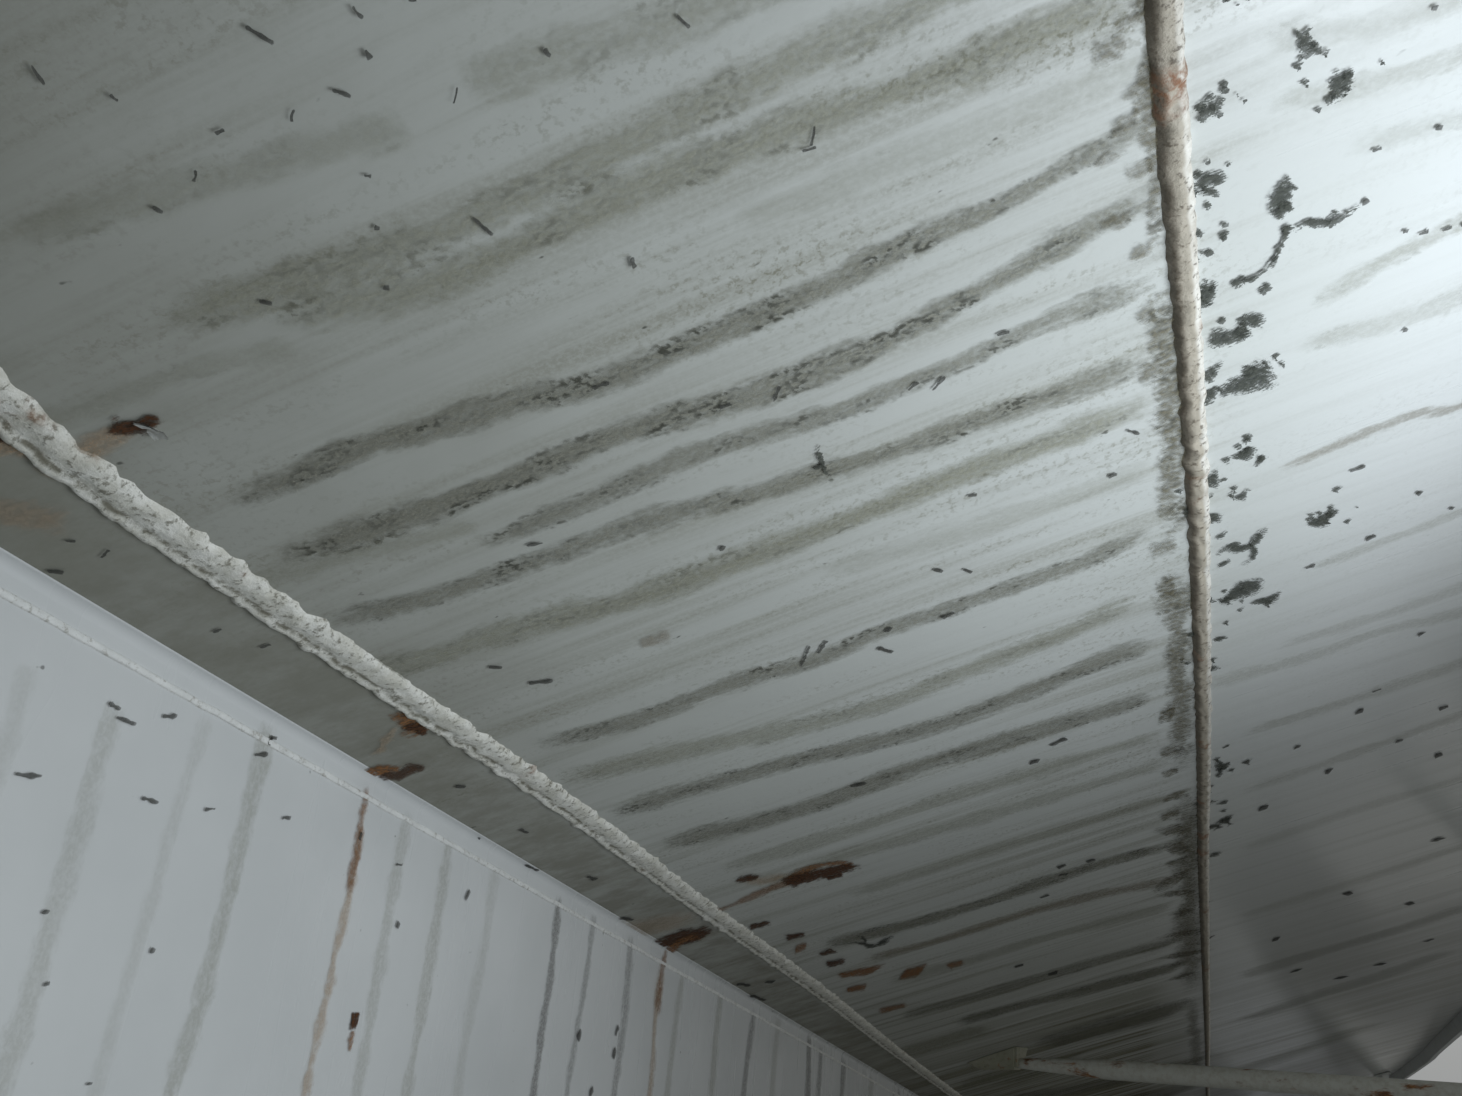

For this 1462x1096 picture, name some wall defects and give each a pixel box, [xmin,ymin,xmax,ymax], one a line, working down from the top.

rust [390,713,429,737]
rust [366,763,425,781]
rust [348,793,368,886]
rust [718,861,859,911]
rust [655,926,712,1003]
rust [786,933,884,992]
rust [901,963,928,980]
damp [532,906,561,1096]
rust [348,1012,360,1050]